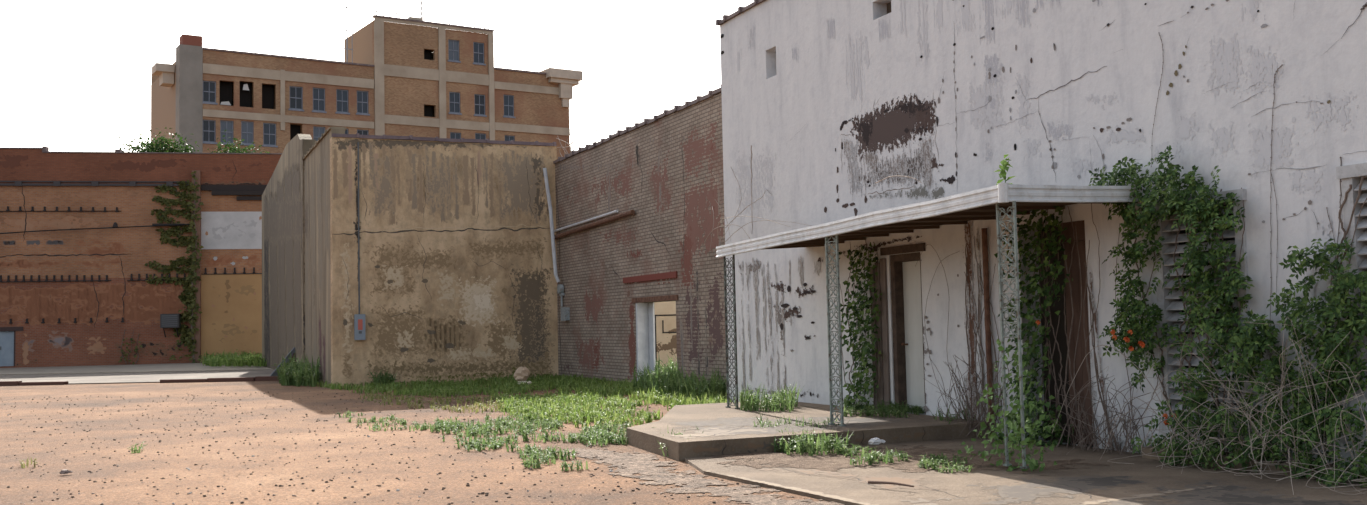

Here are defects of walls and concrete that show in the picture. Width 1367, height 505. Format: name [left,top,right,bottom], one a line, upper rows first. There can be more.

spalling [824,52,975,216]
crack [841,22,1137,196]
damp [979,0,1002,111]
damp [201,135,718,382]
peeling [592,113,816,379]
damp [738,256,821,392]
damp [959,221,996,433]